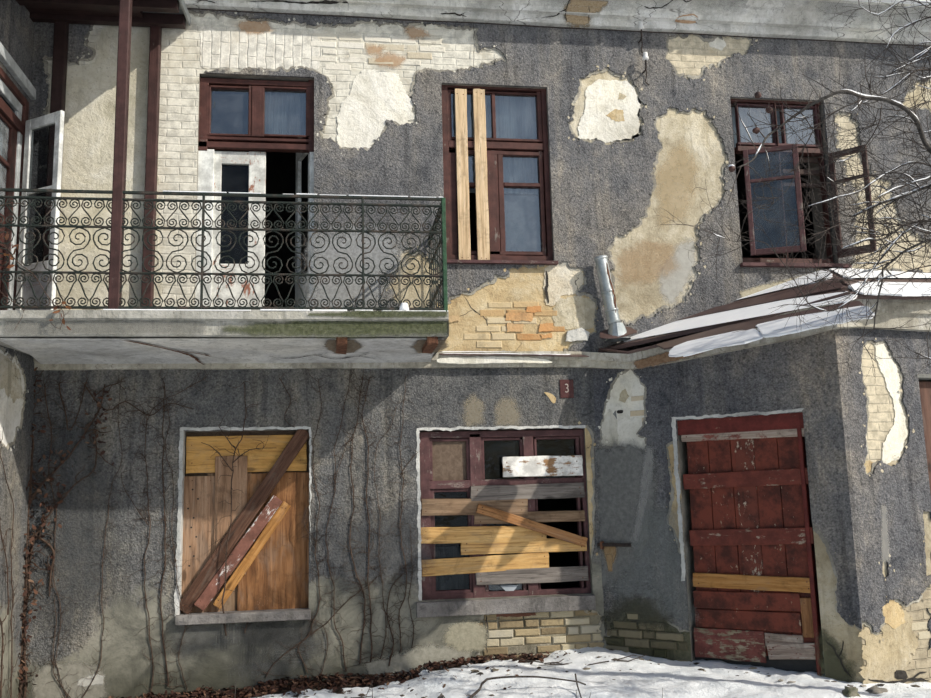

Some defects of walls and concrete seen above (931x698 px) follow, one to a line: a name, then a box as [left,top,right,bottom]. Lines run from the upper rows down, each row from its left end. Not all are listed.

flaking render [564,0,608,28]
flaking render [665,14,759,81]
flaking render [56,25,119,310]
flaking render [121,27,150,306]
flaking render [154,9,507,310]
flaking render [568,65,732,326]
flaking render [385,246,604,364]
flaking render [0,347,29,450]
flaking render [578,369,648,577]
flaking render [859,336,915,477]
flaking render [366,610,692,678]
flaking render [812,506,931,684]